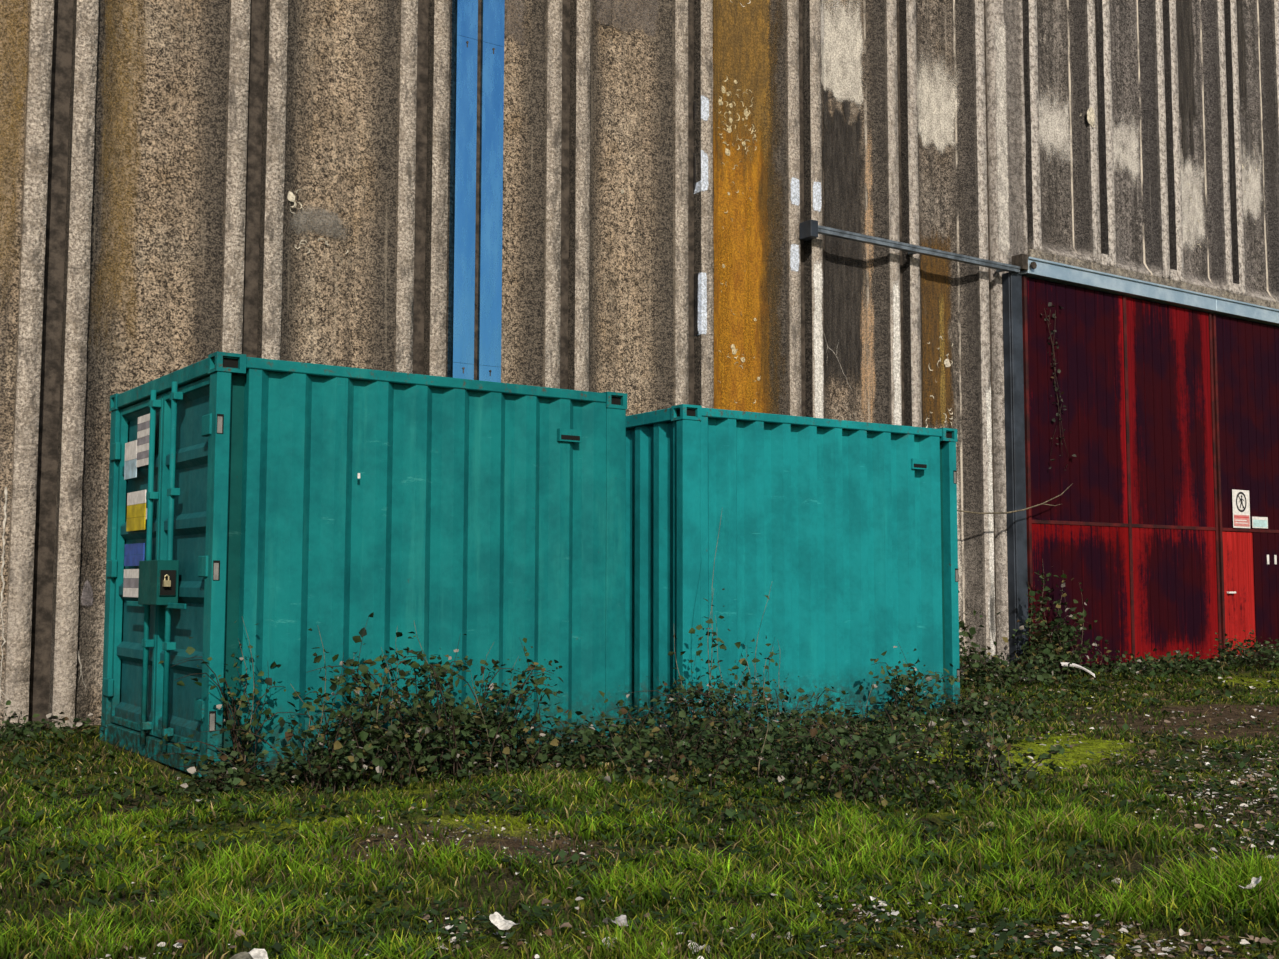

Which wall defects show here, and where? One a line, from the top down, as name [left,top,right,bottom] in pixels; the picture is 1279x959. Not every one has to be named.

corrosion [713,0,780,414]
leakage [813,0,866,418]
leakage [917,65,957,151]
leakage [995,23,1010,254]
leakage [1039,96,1070,156]
leakage [1113,120,1140,180]
leakage [1176,0,1204,248]
leakage [1236,0,1247,110]
leakage [1241,150,1261,225]
leakage [893,284,902,425]
corrosion [920,234,954,428]